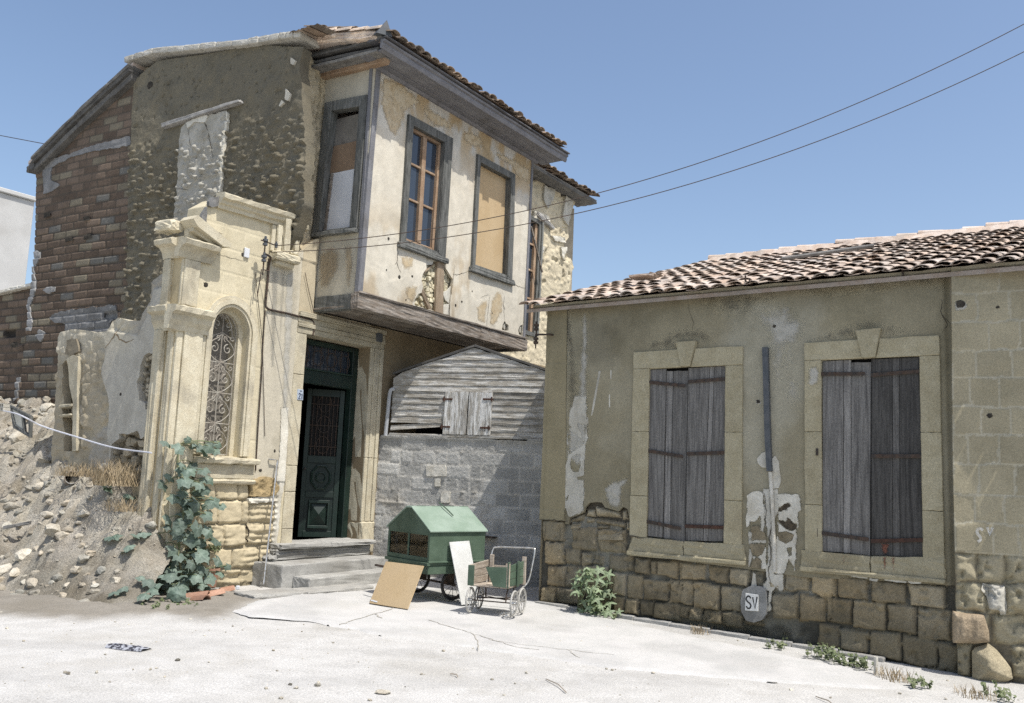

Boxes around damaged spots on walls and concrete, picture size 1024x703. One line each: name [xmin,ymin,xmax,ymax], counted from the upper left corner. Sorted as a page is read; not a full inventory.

flaking render [173,111,230,222]
flaking render [386,257,463,315]
flaking render [543,235,567,261]
peeling [565,396,630,540]
flaking render [746,452,801,611]